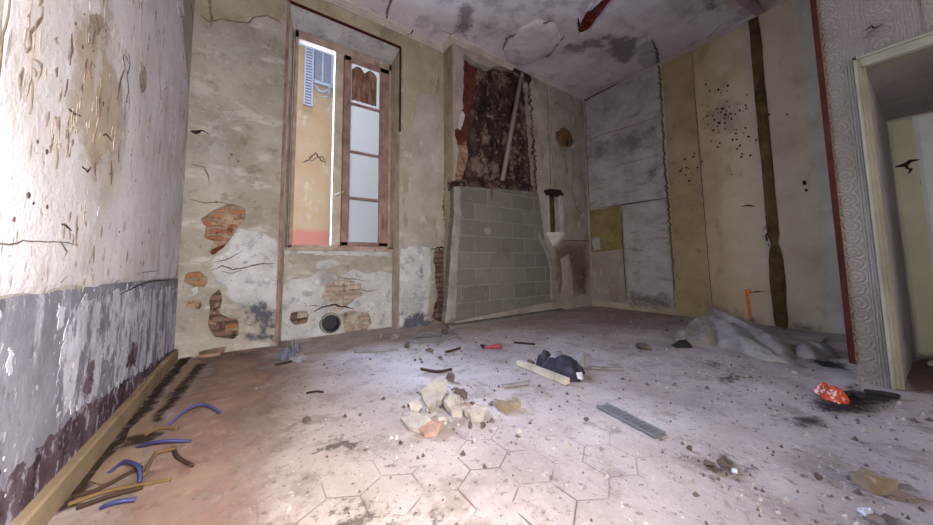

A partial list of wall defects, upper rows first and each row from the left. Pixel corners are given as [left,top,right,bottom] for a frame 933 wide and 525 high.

crack [178,1,281,52]
leakage [77,24,122,165]
peeling [195,0,444,322]
spalling [528,84,539,187]
peeling [0,0,239,424]
crack [0,224,76,283]
crack [108,270,171,295]
spalling [290,310,308,325]
spalling [321,279,371,332]